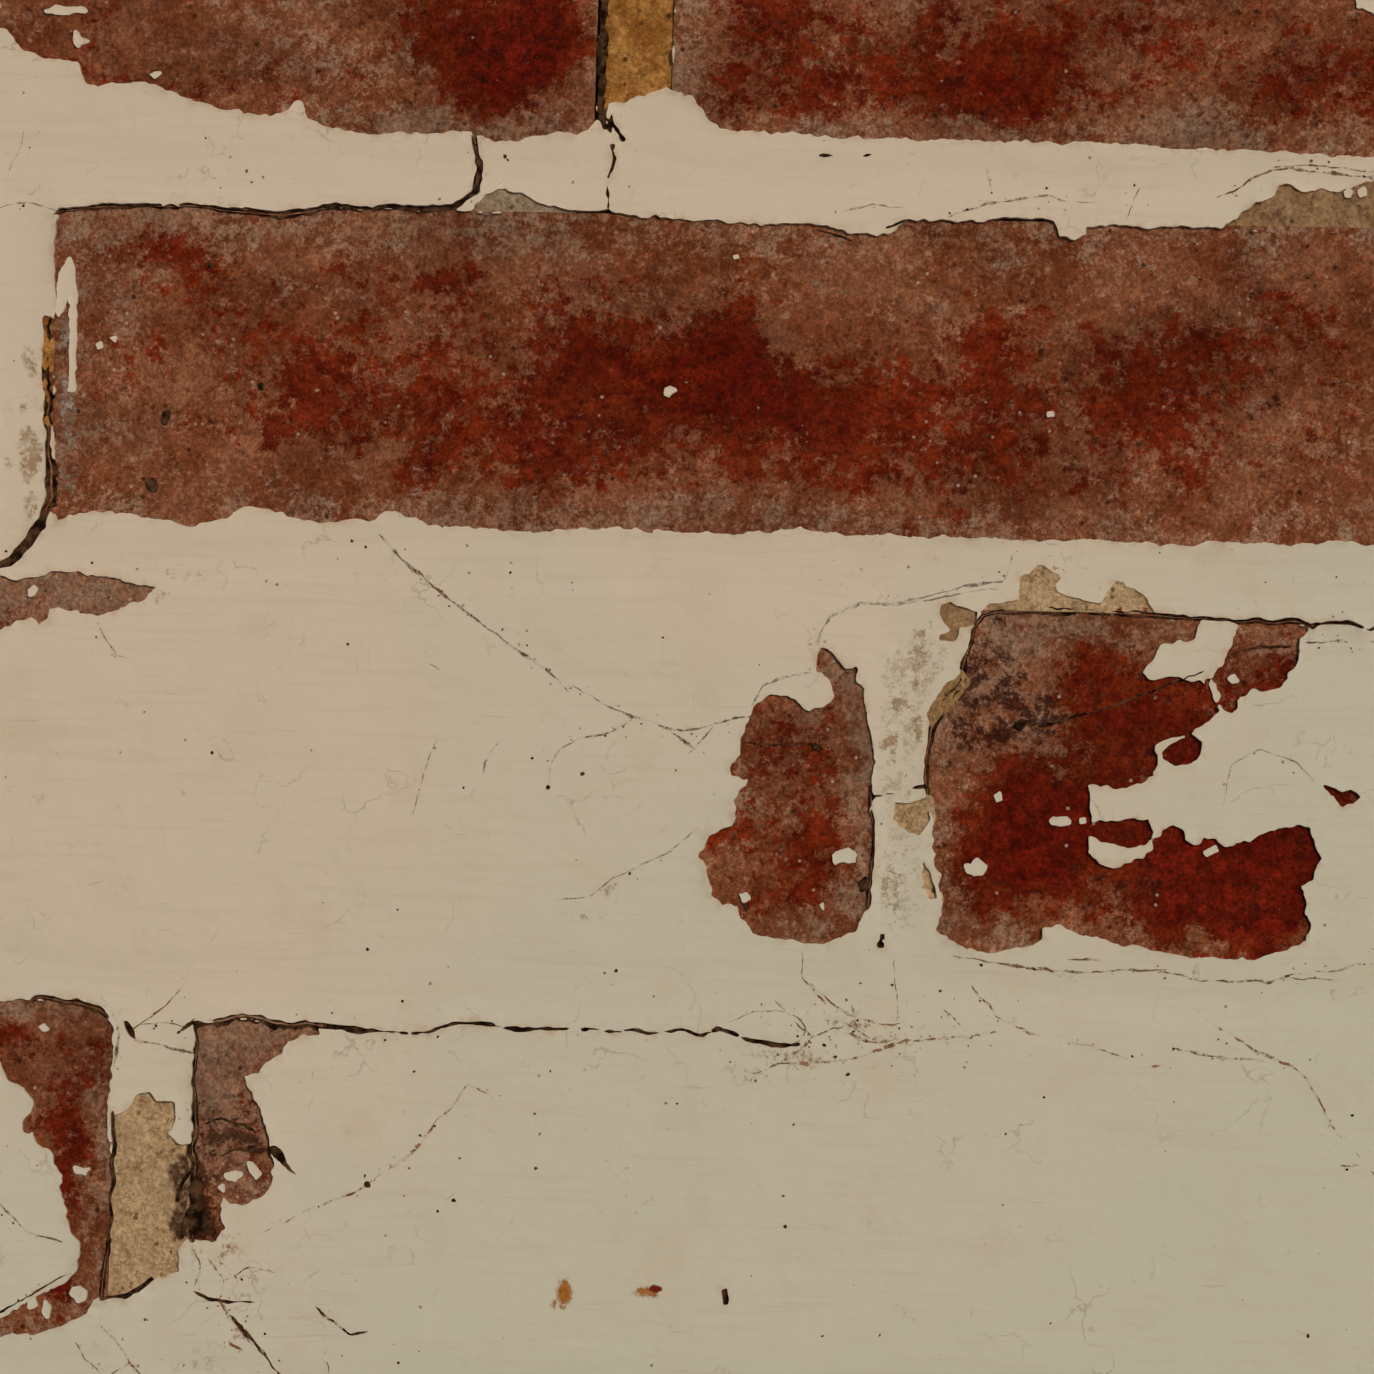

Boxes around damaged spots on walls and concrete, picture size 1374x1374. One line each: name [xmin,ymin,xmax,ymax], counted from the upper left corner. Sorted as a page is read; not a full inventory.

peeling [0,0,1374,158]
peeling [41,181,1374,546]
peeling [0,571,155,630]
crack [380,535,814,771]
peeling [698,648,880,944]
crack [821,557,1374,909]
peeling [893,565,1321,960]
peeling [0,995,323,1337]
crack [31,955,1341,1374]